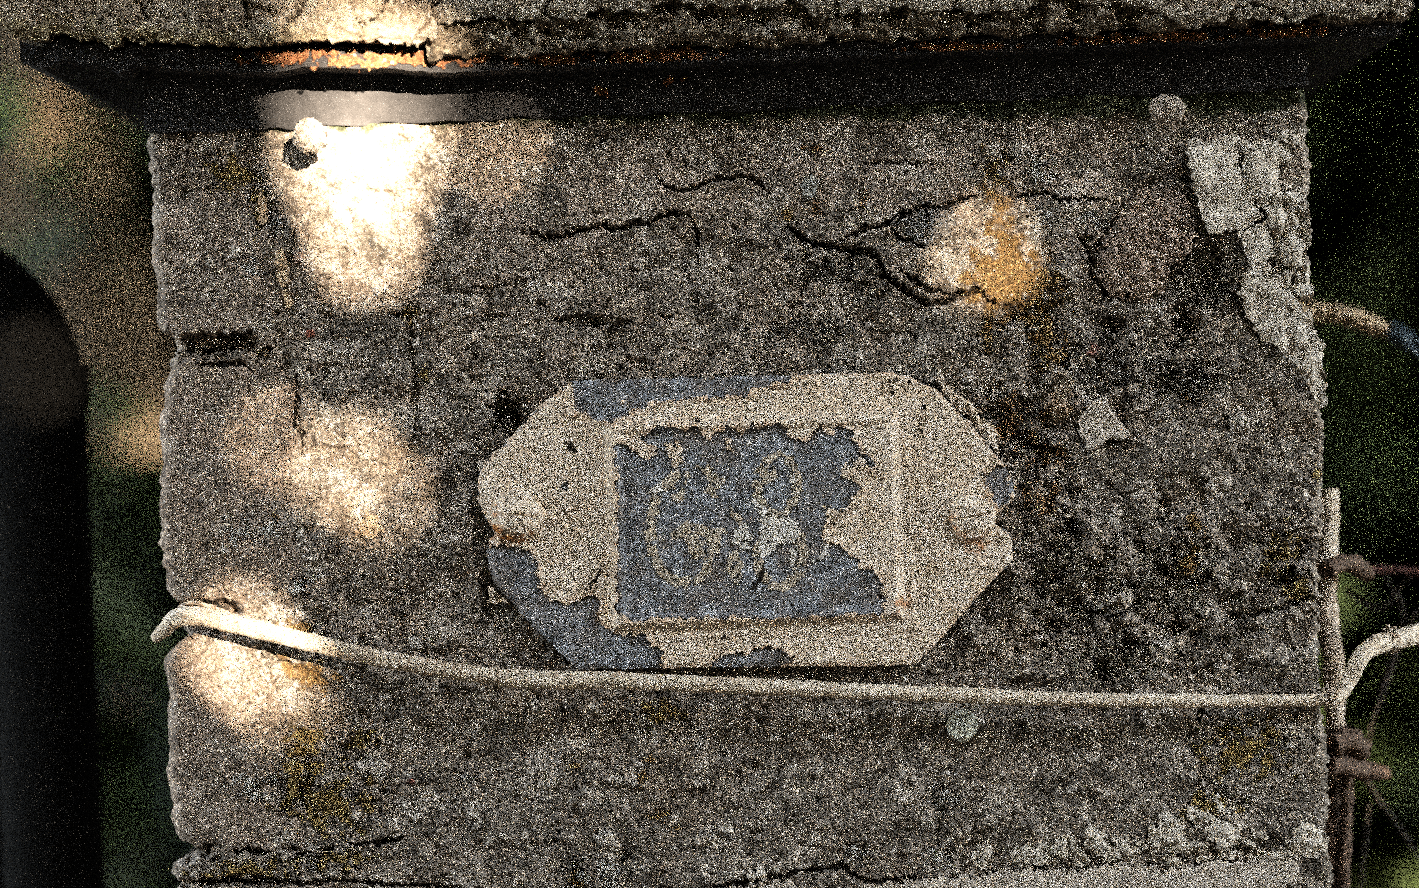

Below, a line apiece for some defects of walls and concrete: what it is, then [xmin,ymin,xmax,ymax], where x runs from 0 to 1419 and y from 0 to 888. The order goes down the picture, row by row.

crack [864,158,943,166]
crack [530,174,770,261]
crack [1011,191,1120,206]
crack [787,195,994,307]
crack [1077,236,1112,302]
peeling [1167,125,1328,408]
crack [193,836,461,888]
peeling [725,862,797,888]
peeling [837,793,1330,888]